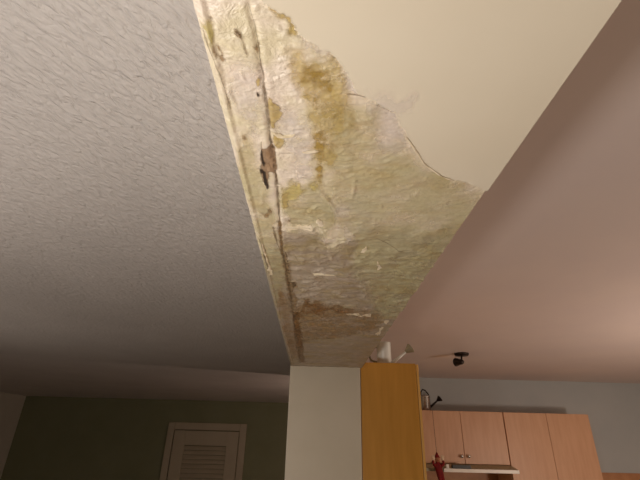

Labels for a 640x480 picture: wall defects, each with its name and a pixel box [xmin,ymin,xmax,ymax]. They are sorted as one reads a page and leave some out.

crack [246,39,274,148]
water stain [268,99,284,148]
crack [273,165,304,362]
water stain [281,185,334,229]
peeling [193,0,485,368]
water stain [293,56,474,317]